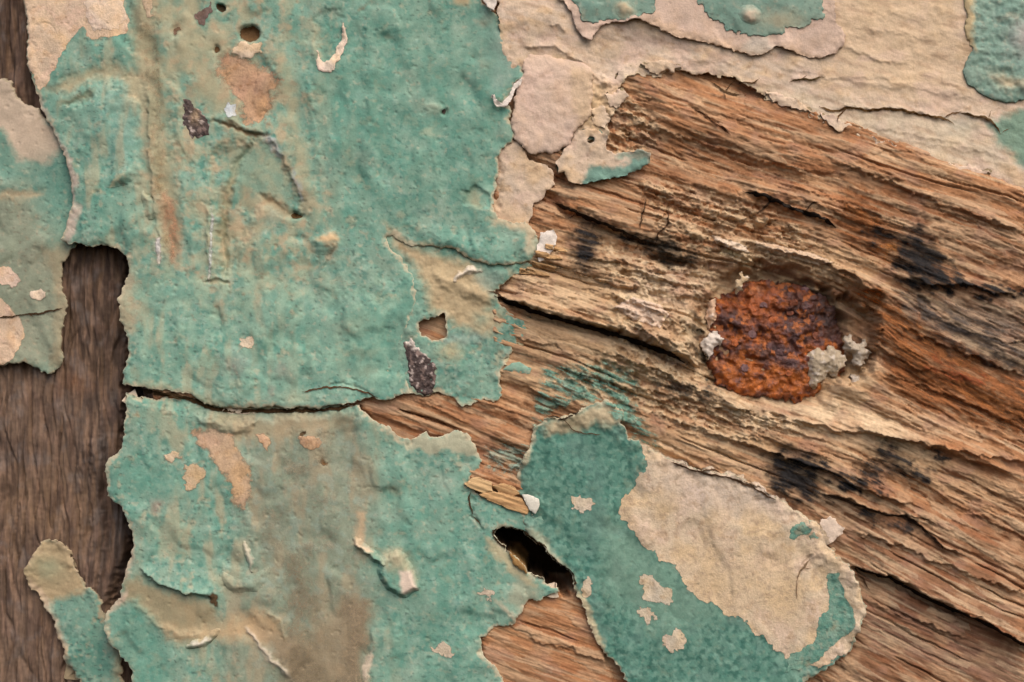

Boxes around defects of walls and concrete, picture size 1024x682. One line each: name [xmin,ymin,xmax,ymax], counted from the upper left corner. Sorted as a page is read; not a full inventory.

peeling [23,0,130,90]
peeling [491,79,522,107]
peeling [591,89,629,129]
peeling [765,90,852,133]
peeling [536,230,557,262]
peeling [0,266,21,288]
peeling [0,298,25,365]
crack [134,386,462,431]
peeling [522,494,540,514]
spalling [571,495,595,513]
peeling [618,440,866,672]
peeling [23,539,125,682]